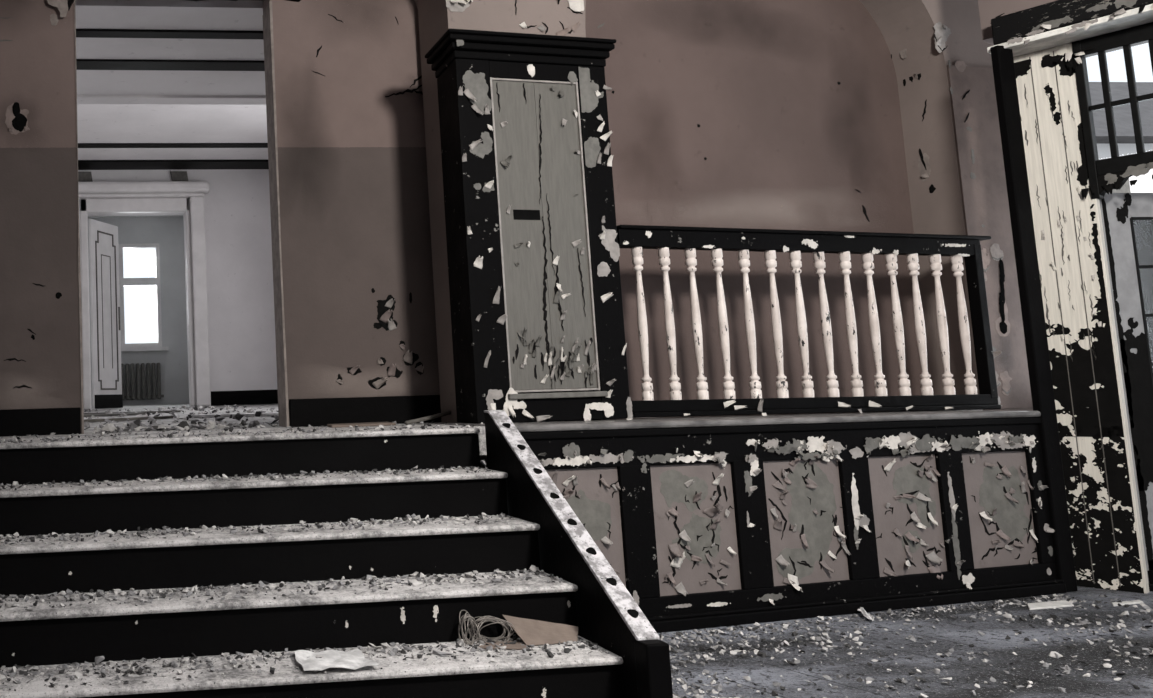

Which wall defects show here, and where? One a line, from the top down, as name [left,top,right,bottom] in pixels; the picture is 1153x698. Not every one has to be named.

peeling [458,70,508,162]
peeling [551,67,613,168]
peeling [1044,83,1061,125]
peeling [1014,45,1094,78]
peeling [474,248,493,269]
crack [496,83,586,388]
peeling [597,215,629,277]
peeling [486,387,552,422]
peeling [512,327,633,421]
peeling [1045,122,1153,594]
peeling [538,443,754,609]
peeling [744,431,1055,605]